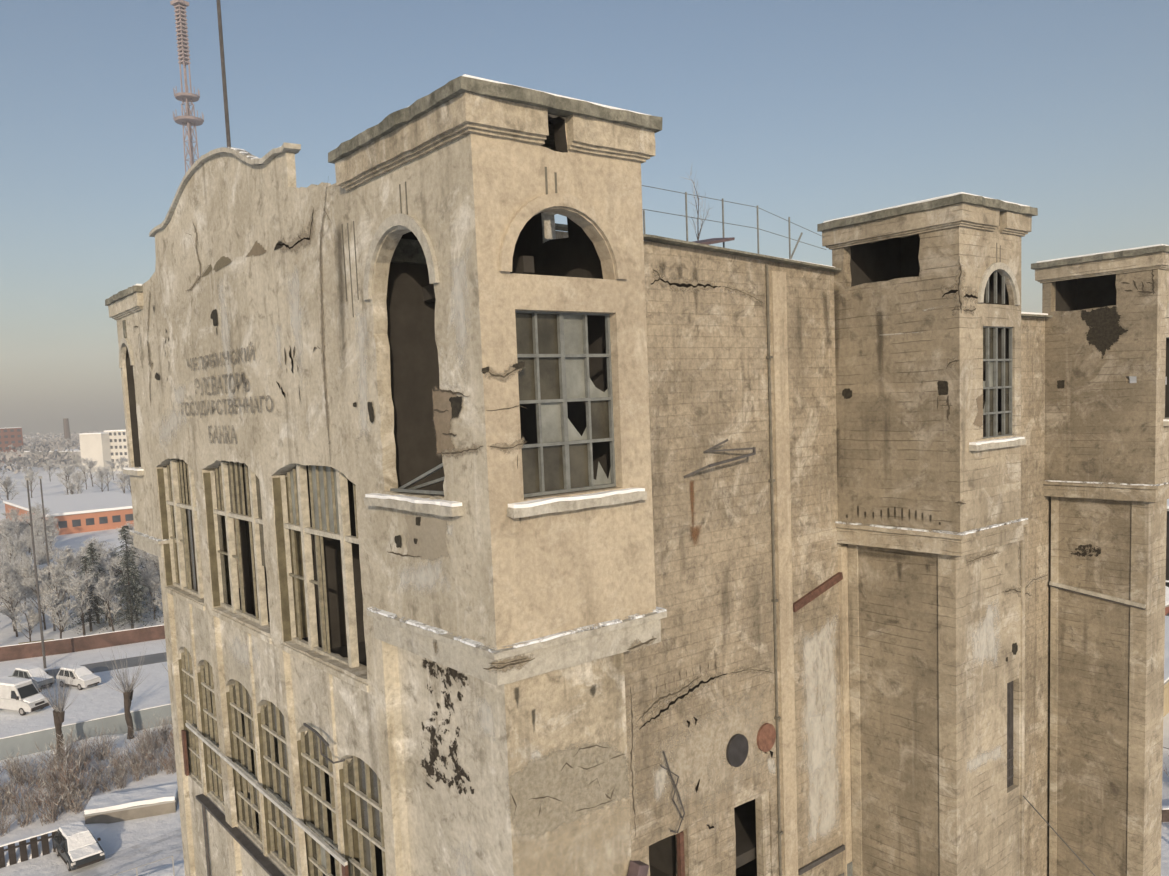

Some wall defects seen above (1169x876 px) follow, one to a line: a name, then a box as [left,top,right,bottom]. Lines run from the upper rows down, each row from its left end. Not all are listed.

crack [188,224,209,291]
crack [651,270,763,303]
spalling [1122,270,1155,294]
peeling [1081,306,1128,359]
spalling [432,387,468,455]
corrosion [690,481,699,542]
peeling [421,658,474,796]